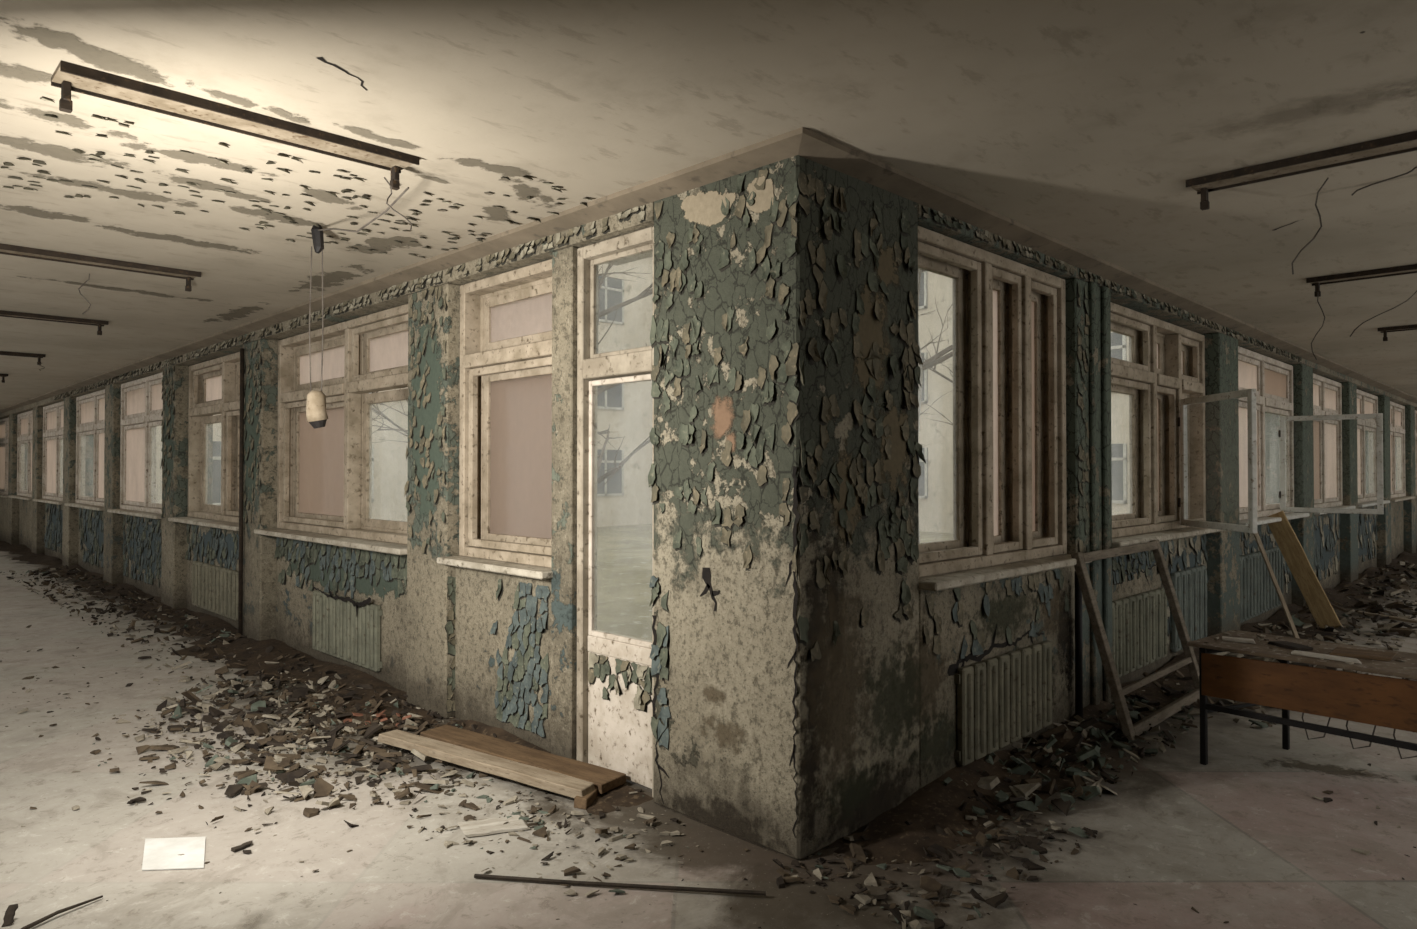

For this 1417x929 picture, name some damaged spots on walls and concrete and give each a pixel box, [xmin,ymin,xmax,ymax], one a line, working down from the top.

peeling [0,17,166,85]
flaking render [0,63,1302,663]
peeling [490,579,551,739]
peeling [588,575,672,751]